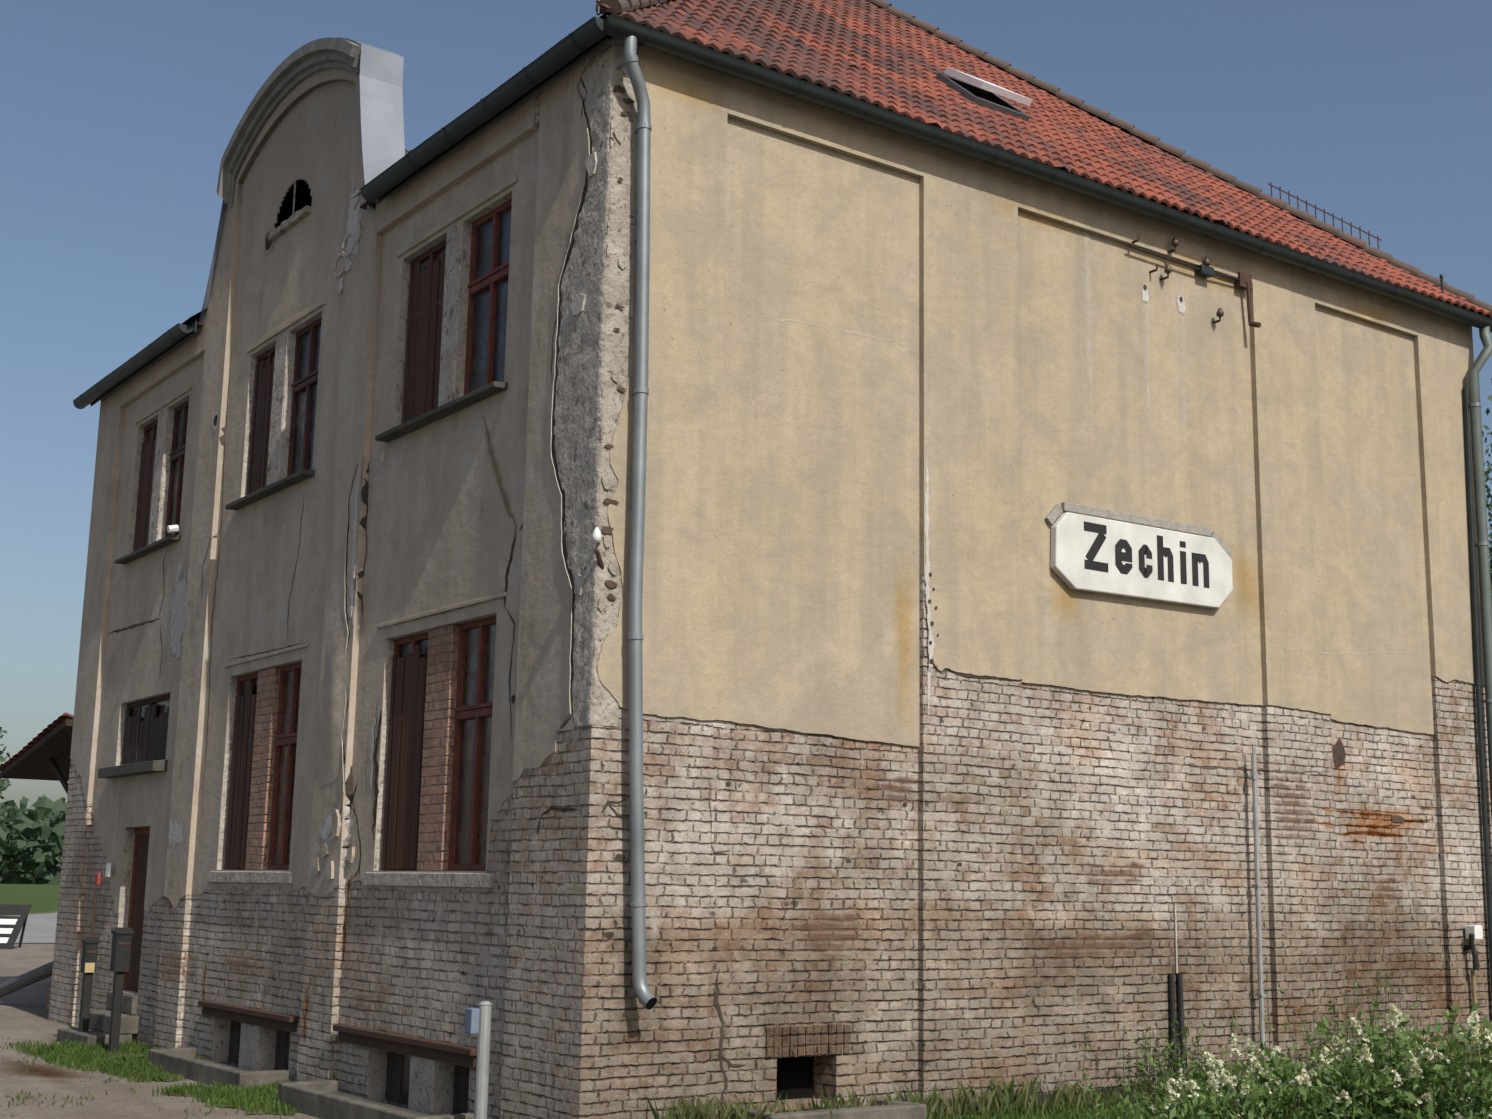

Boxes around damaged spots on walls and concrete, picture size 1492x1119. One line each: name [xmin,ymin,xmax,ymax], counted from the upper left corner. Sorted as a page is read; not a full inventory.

crack [550,53,593,729]
spalling [554,49,638,727]
crack [108,547,167,677]
crack [201,363,304,813]
flaking render [348,464,364,631]
crack [344,461,523,738]
flaking render [313,809,355,879]
crack [327,695,361,879]
rust [1335,807,1434,843]